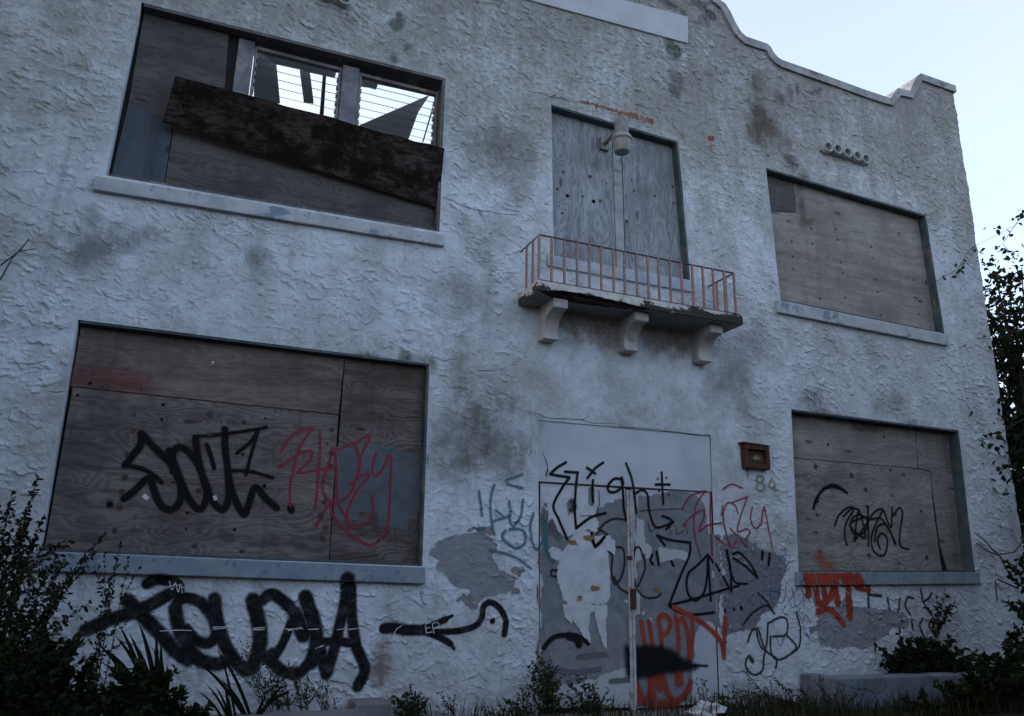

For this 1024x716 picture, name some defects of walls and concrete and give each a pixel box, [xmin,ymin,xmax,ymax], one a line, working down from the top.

rust [580,100,655,125]
peeling [429,523,525,610]
peeling [809,597,909,650]